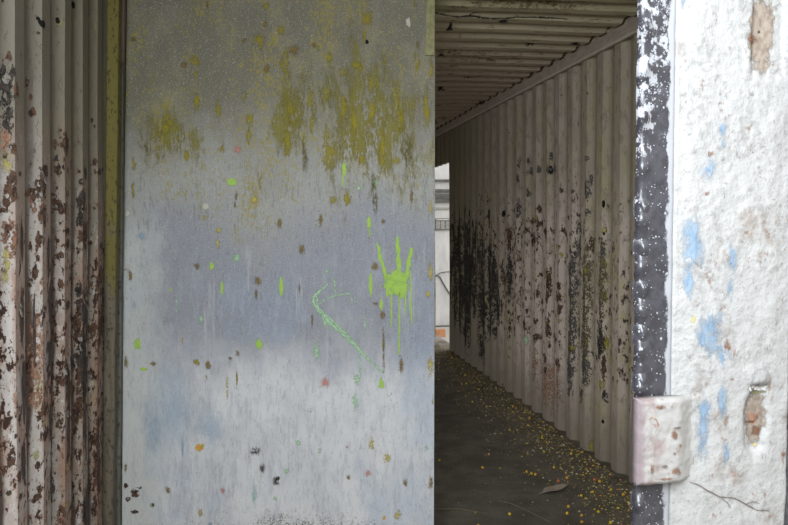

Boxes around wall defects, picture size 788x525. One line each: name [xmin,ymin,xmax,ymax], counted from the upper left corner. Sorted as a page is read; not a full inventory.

spalling [747,0,777,75]
water stain [378,99,412,169]
corrosion [0,129,70,260]
corrosion [27,262,44,287]
corrosion [88,264,104,348]
corrosion [27,316,47,422]
corrosion [55,359,72,430]
spalling [744,385,767,443]
corrosion [1,426,21,483]